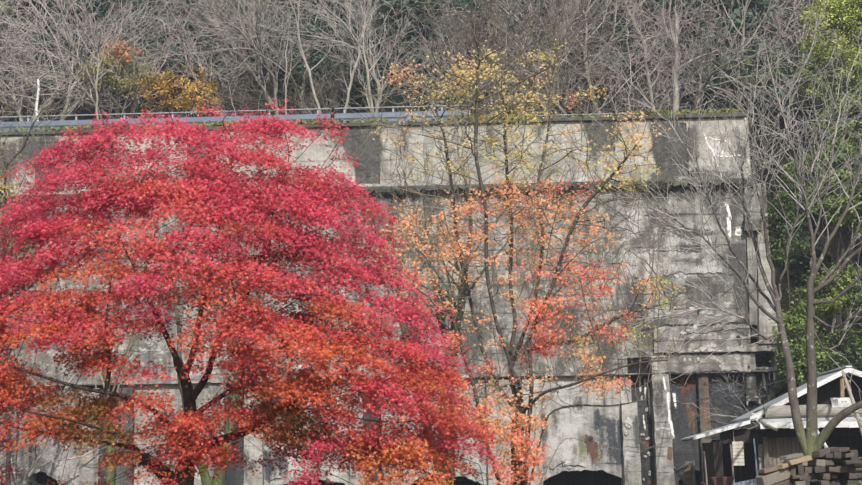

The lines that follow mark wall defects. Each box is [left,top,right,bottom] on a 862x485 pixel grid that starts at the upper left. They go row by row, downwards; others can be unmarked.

rust [585,436,597,462]
leakage [574,409,628,481]
leakage [633,376,687,450]